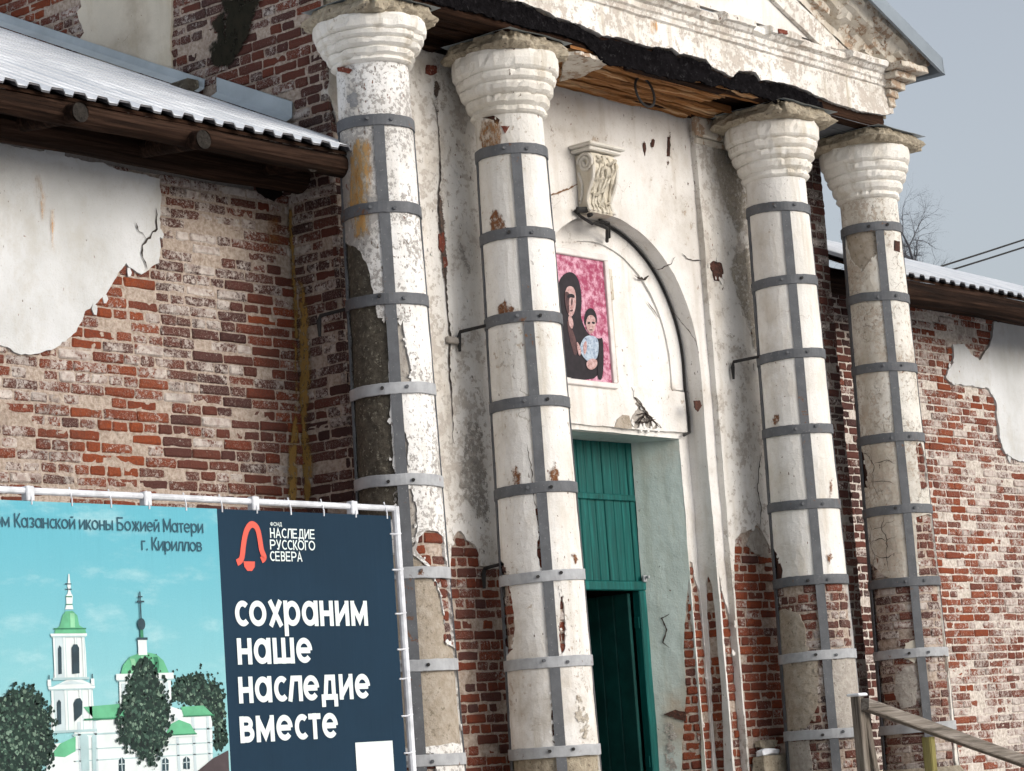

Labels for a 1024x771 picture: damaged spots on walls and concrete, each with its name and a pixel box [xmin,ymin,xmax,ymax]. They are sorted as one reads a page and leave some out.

crack [136,210,158,267]
corrosion [348,139,372,238]
crack [434,81,454,437]
corrosion [479,121,501,148]
corrosion [490,209,506,231]
peeling [708,139,747,233]
spalling [0,165,308,512]
spalling [347,244,599,771]
spalling [664,158,1024,771]
crack [865,453,895,577]